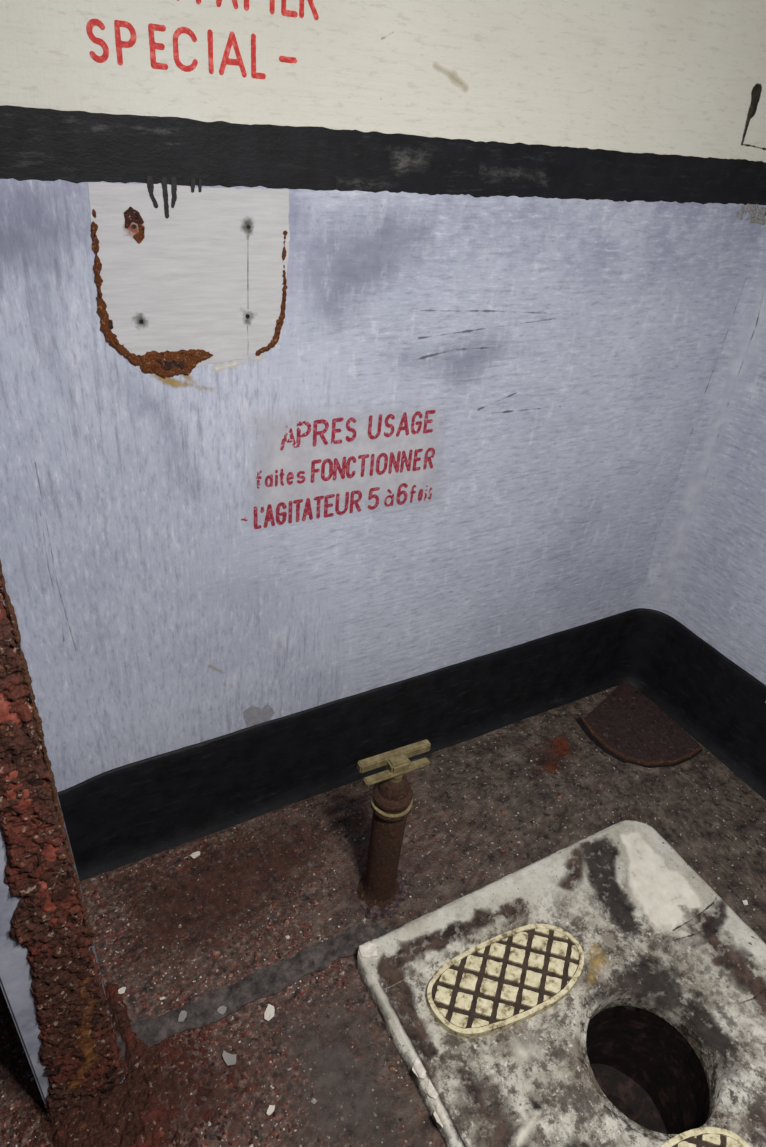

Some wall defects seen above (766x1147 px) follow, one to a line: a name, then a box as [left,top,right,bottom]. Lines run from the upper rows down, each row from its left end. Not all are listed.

damp [741,105,754,145]
rust [90,207,213,379]
peeling [88,182,290,367]
rust [256,231,288,356]
rust [0,559,125,1121]